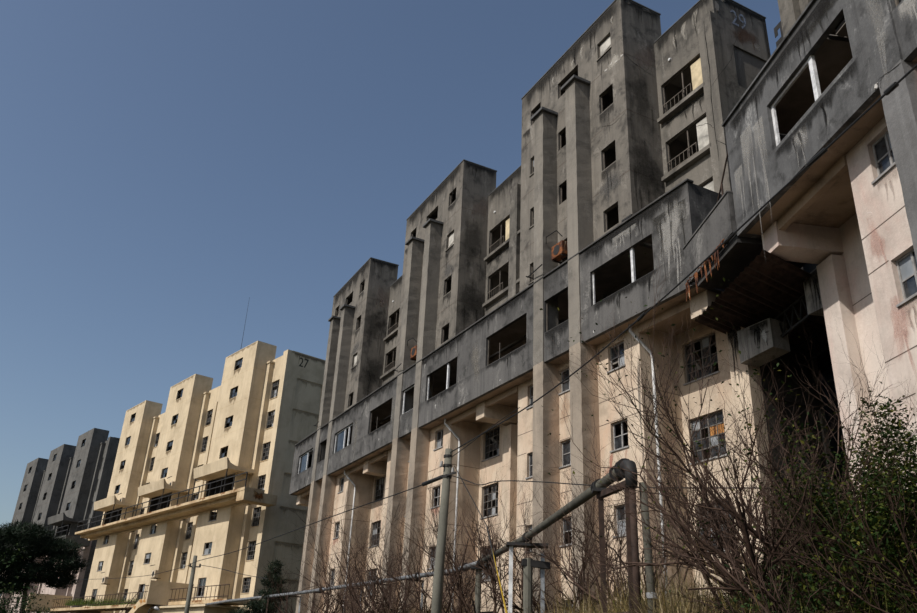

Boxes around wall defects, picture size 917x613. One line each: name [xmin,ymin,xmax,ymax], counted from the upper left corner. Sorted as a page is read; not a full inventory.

damp [899,0,917,18]
damp [777,61,856,153]
damp [586,141,685,310]